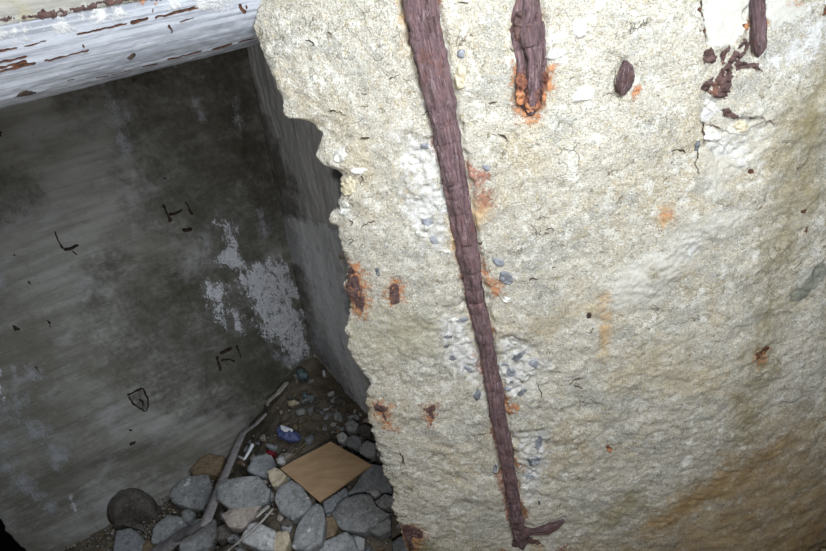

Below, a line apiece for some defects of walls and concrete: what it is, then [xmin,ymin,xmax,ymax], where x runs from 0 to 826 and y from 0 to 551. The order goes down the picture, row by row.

corrosion [0,40,89,73]
spalling [0,0,129,42]
corrosion [77,6,199,35]
spalling [616,60,635,96]
corrosion [701,17,763,119]
spalling [703,0,826,68]
spalling [694,95,750,166]
corrosion [466,160,495,224]
damp [104,62,369,414]
corrosion [345,258,373,321]
corrosion [383,277,408,307]
spalling [395,0,565,550]